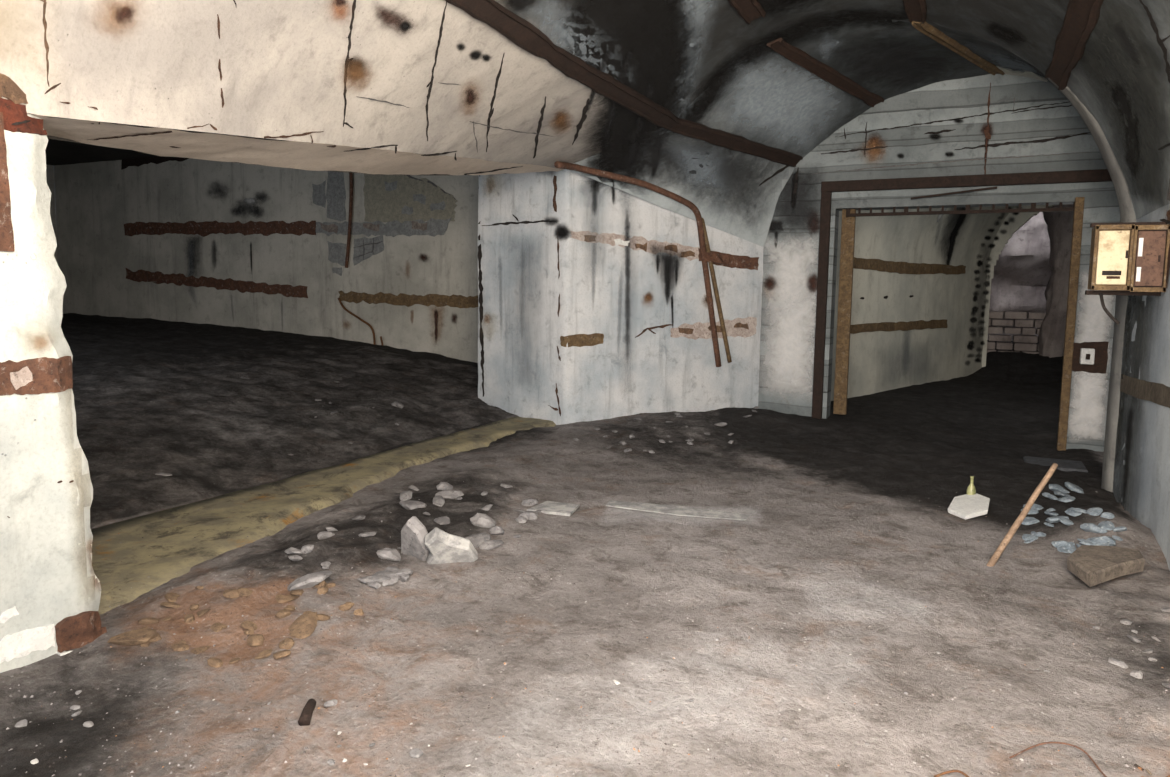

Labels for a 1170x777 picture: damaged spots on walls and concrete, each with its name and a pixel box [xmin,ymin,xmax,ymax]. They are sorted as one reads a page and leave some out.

crack [40,0,61,94]
corrosion [112,5,132,22]
crack [217,0,236,108]
crack [343,0,459,141]
damp [536,0,632,84]
damp [679,0,712,115]
spalling [312,171,458,276]
corrosion [126,268,308,298]
damp [656,255,678,327]
corrosion [0,342,73,396]